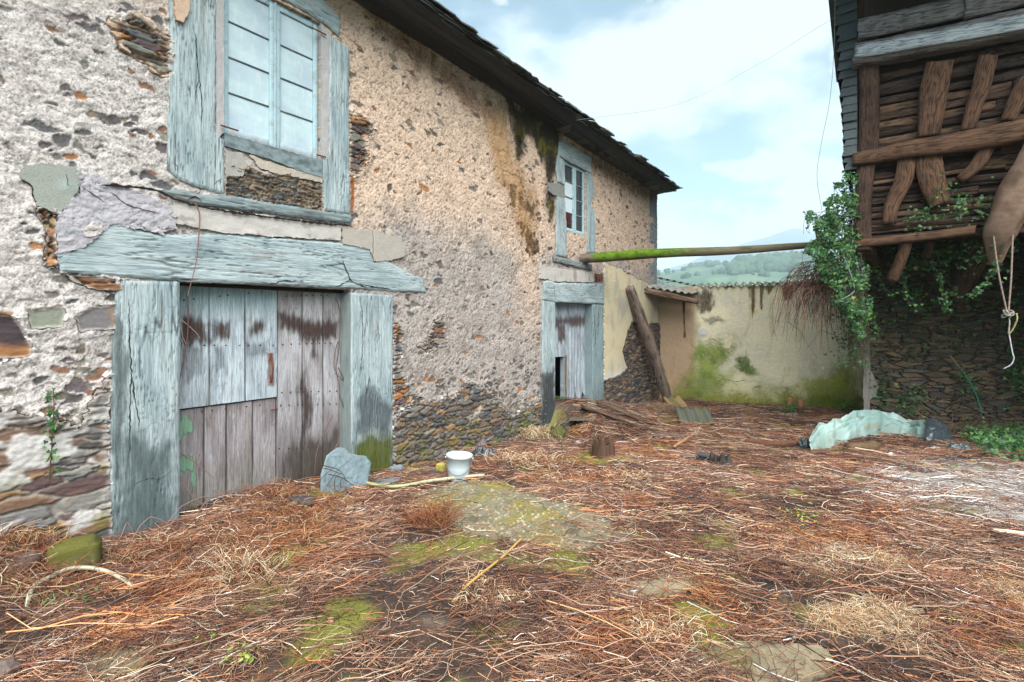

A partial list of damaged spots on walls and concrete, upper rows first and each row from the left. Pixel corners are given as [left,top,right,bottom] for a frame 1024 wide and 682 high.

flaking render [106,11,175,78]
flaking render [348,107,377,179]
leakage [373,15,556,261]
flaking render [224,165,324,211]
flaking render [36,207,122,292]
leakage [358,387,391,433]
flaking render [392,315,547,468]
flaking render [603,321,661,406]
flaking render [0,370,114,539]